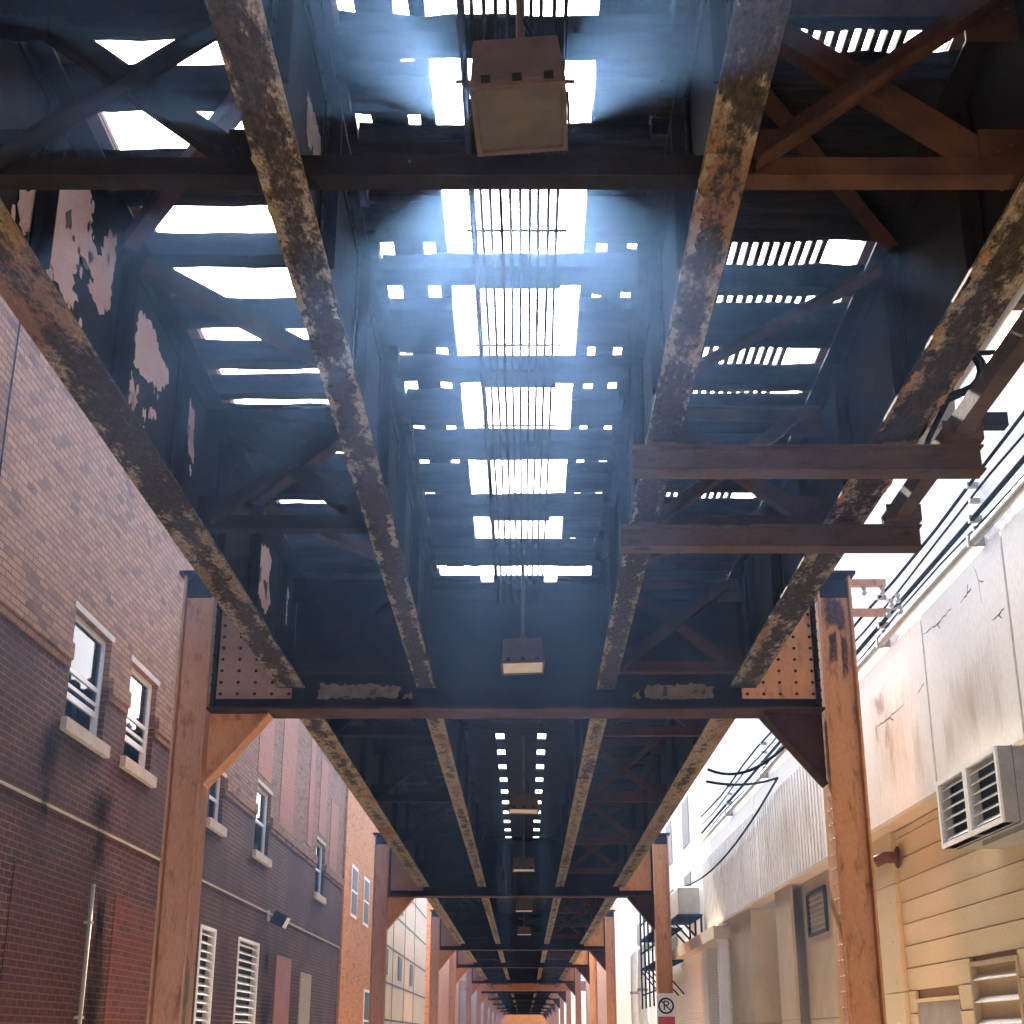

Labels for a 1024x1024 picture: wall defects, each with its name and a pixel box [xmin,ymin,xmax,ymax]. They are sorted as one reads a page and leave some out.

peeling [11,190,36,240]
peeling [46,190,117,328]
peeling [128,310,169,428]
corrosion [879,371,921,432]
corrosion [913,371,964,444]
peeling [205,536,272,623]
crack [924,568,1004,634]
peeling [268,635,302,685]
peeling [317,683,413,699]
peeling [632,682,714,699]
corrosion [824,598,848,677]